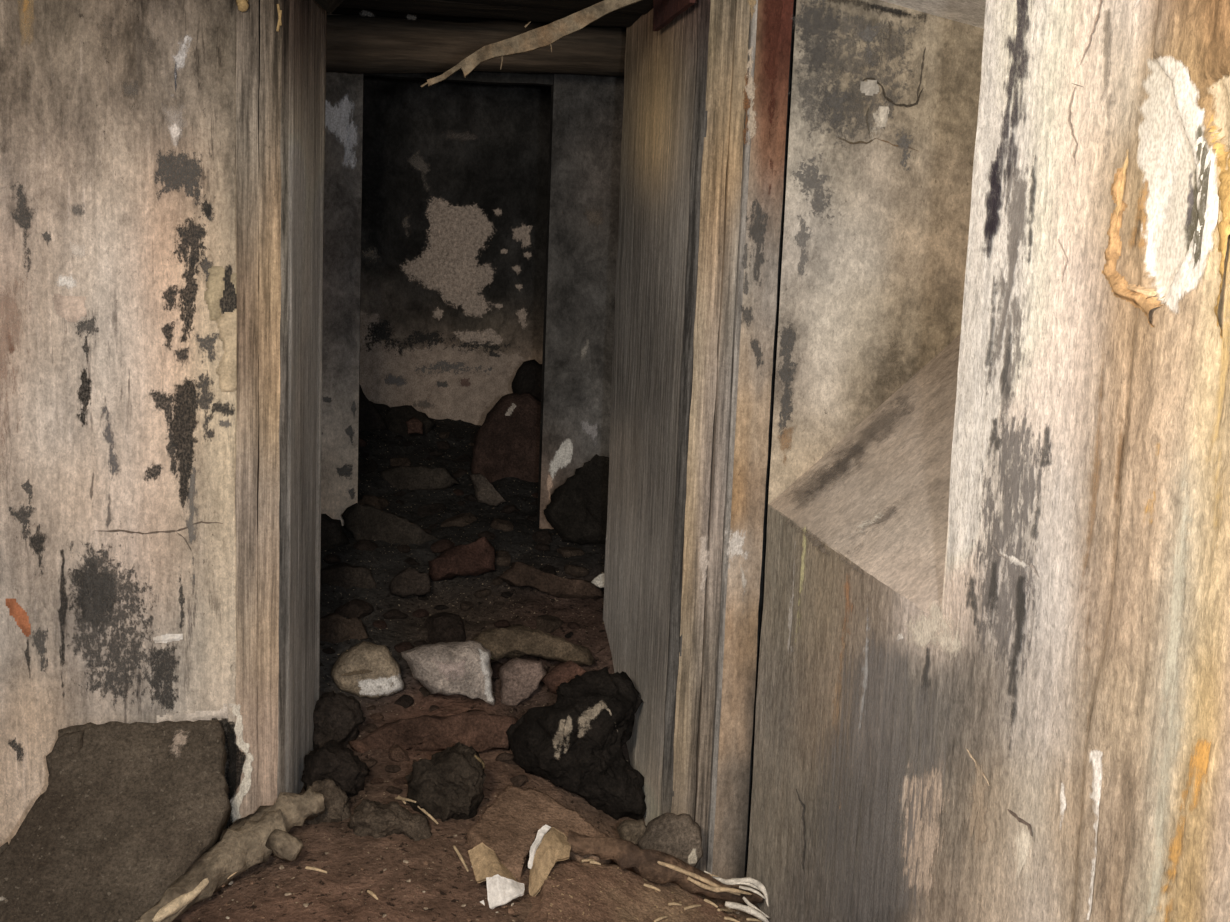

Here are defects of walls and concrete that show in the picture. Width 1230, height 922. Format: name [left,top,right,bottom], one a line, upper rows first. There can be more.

crack [858,26,926,107]
crack [837,137,918,151]
spalling [1130,56,1230,312]
peeling [402,152,503,347]
peeling [501,224,532,291]
peeling [204,265,237,392]
peeling [516,307,527,328]
water stain [989,419,1005,455]
water stain [1040,427,1051,467]
water stain [964,563,997,633]
water stain [1005,575,1026,757]